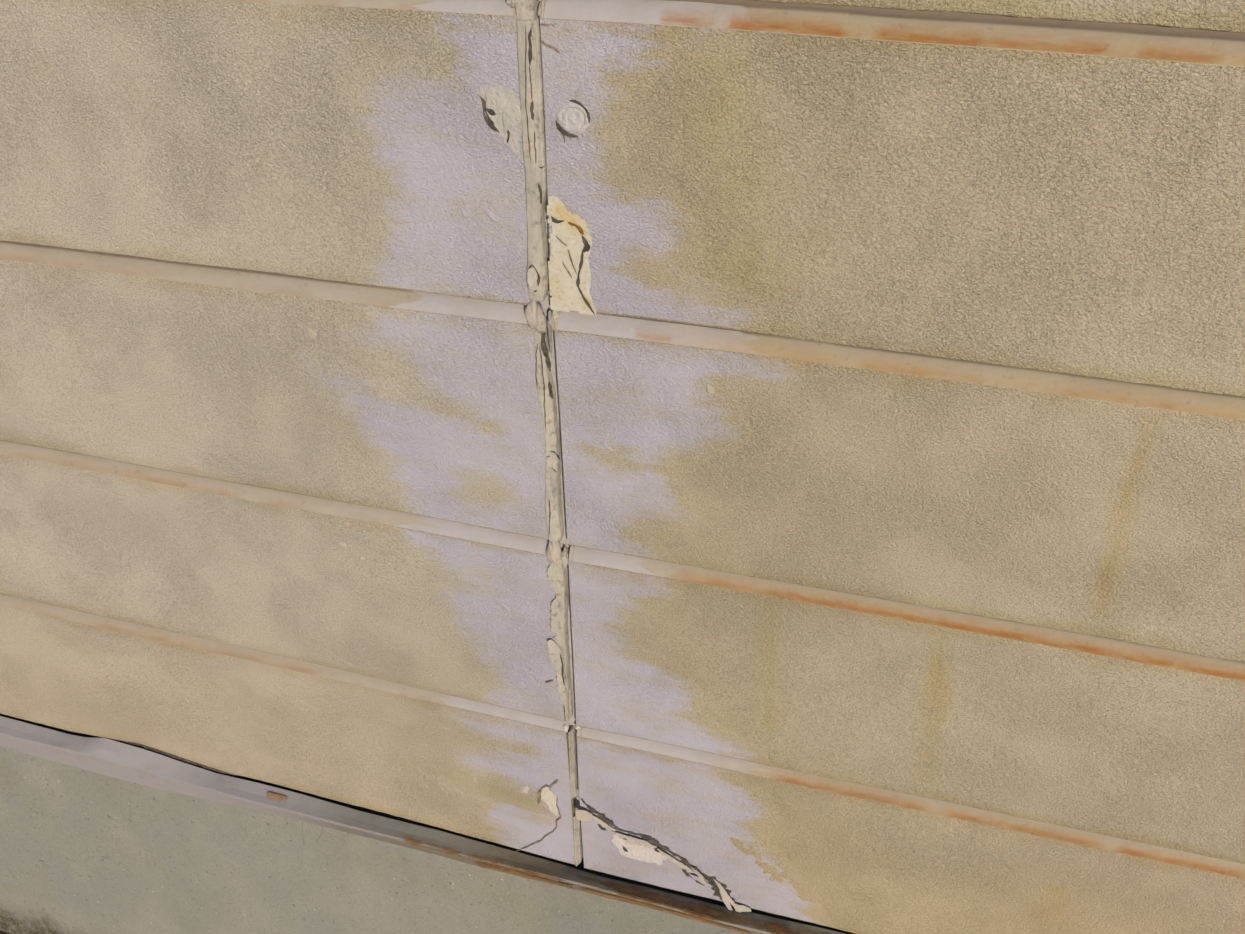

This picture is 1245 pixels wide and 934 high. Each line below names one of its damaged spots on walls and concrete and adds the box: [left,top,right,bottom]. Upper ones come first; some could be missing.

crack [525,24,591,204]
crack [527,264,540,292]
spalling [547,196,596,315]
crack [535,321,560,534]
rust [405,839,805,934]